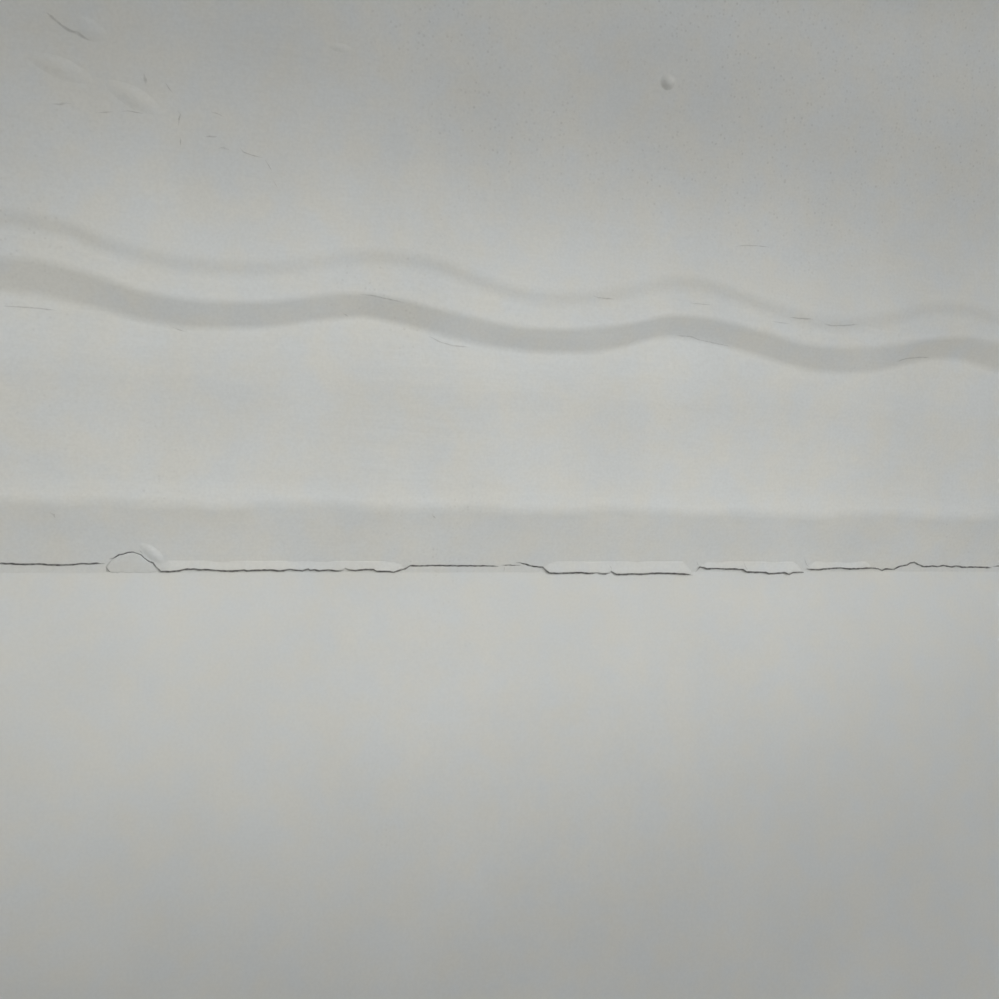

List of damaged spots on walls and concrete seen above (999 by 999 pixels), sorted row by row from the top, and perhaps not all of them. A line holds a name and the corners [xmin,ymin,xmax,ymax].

crack [0,552,989,575]